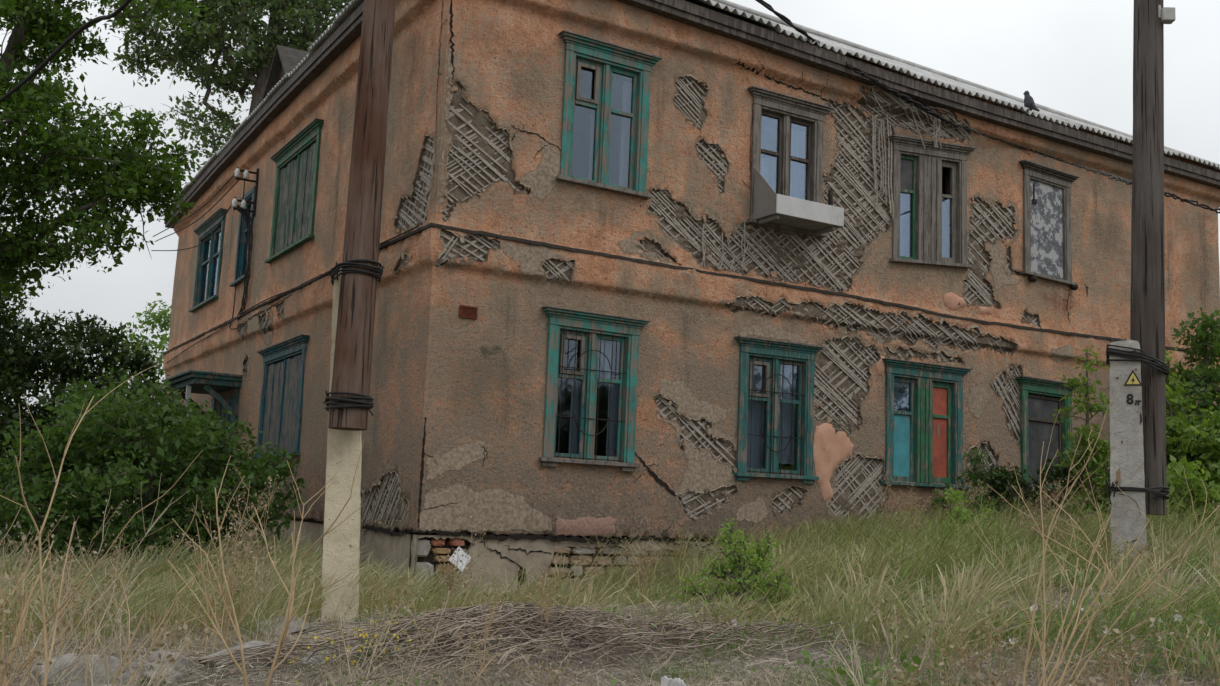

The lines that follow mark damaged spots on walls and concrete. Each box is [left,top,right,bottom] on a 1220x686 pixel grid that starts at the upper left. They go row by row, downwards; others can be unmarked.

crack [435,0,455,138]
spalling [392,48,575,282]
spalling [619,72,1026,524]
peeling [360,441,553,533]
crack [360,417,722,568]